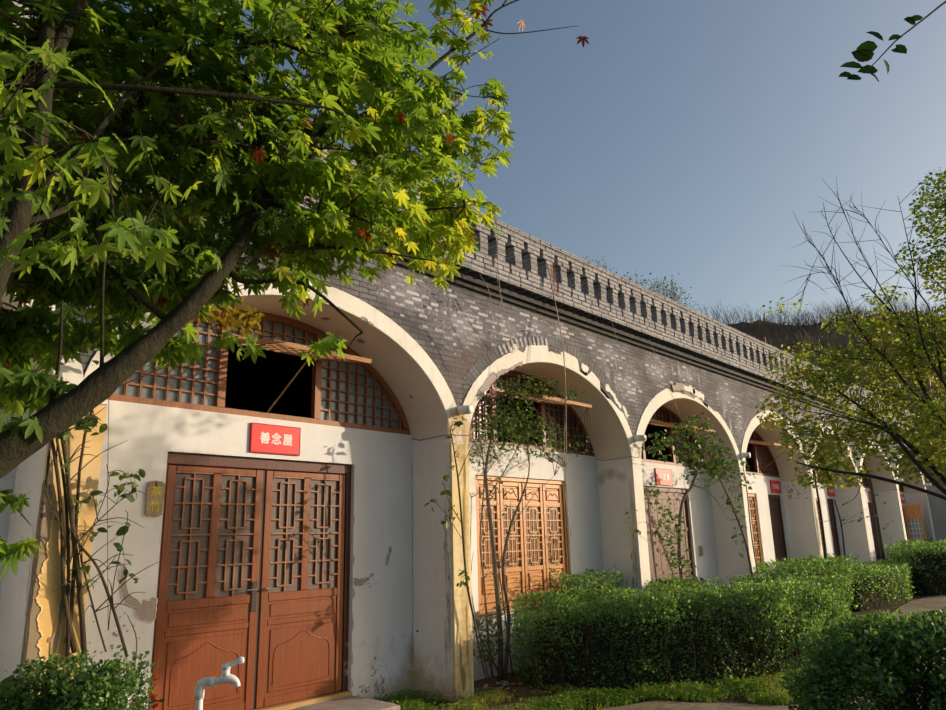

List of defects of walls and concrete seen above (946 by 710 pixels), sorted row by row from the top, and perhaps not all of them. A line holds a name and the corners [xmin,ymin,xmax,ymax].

peeling [477,344,523,400]
peeling [605,384,630,418]
peeling [18,482,67,702]
peeling [89,562,158,653]